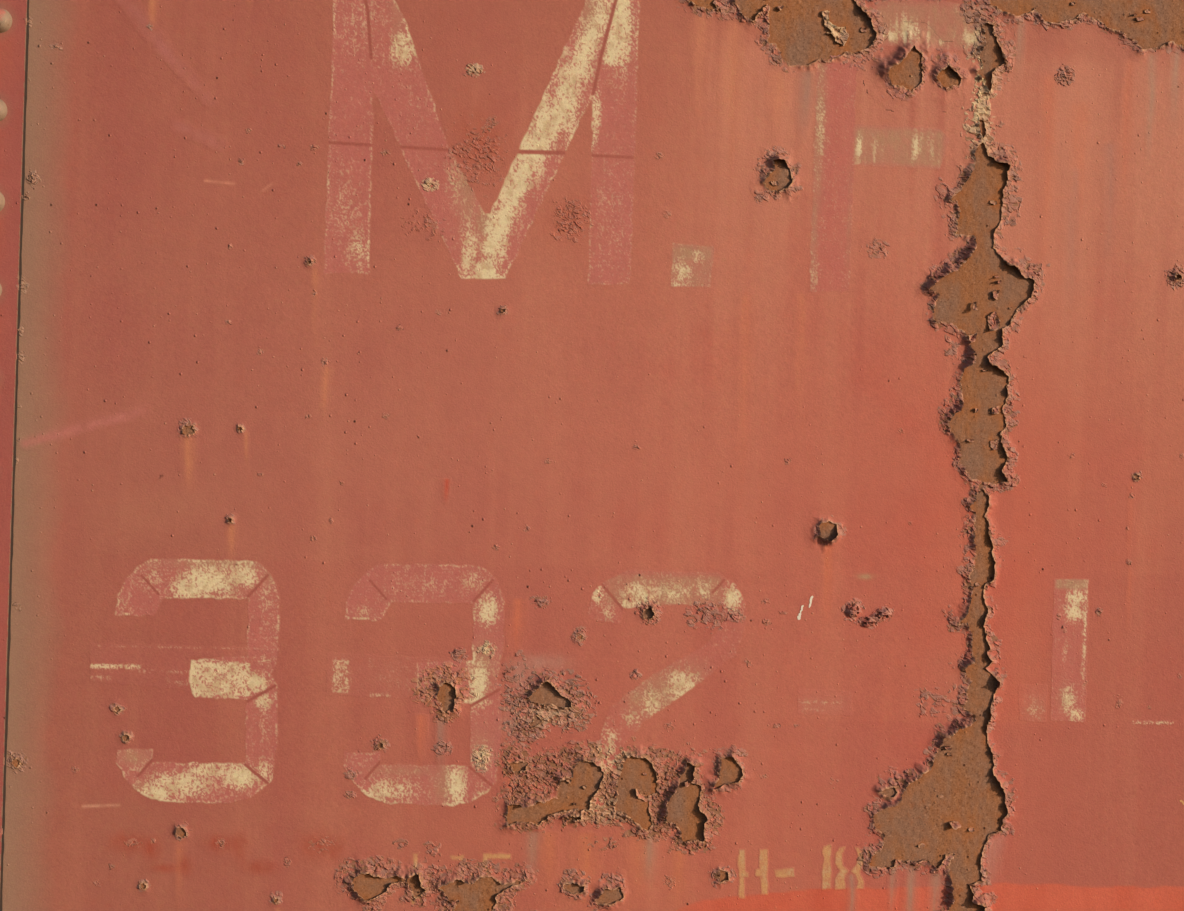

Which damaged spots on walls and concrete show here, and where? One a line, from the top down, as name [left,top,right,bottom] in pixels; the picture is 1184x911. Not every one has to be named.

peeling [675,0,1184,911]
peeling [334,838,633,911]
peeling [410,640,759,891]